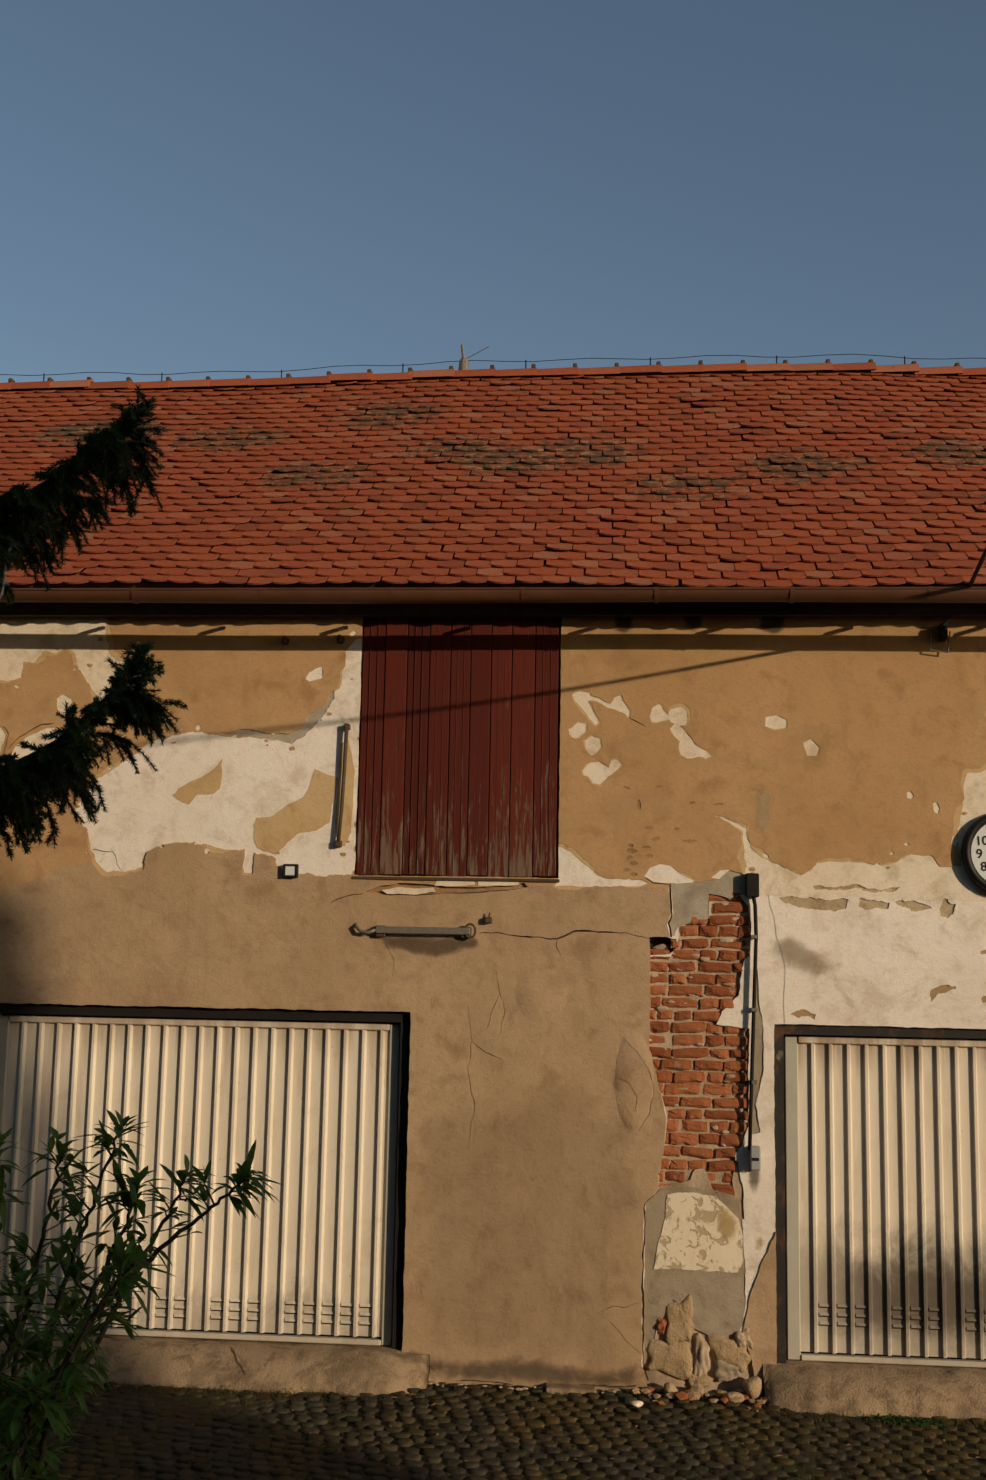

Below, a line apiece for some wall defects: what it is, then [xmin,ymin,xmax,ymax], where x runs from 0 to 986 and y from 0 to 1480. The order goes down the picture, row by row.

peeling [0,617,155,723]
peeling [0,694,73,759]
peeling [74,631,363,877]
crack [333,887,525,902]
crack [479,878,672,955]
flaking render [554,690,986,1394]